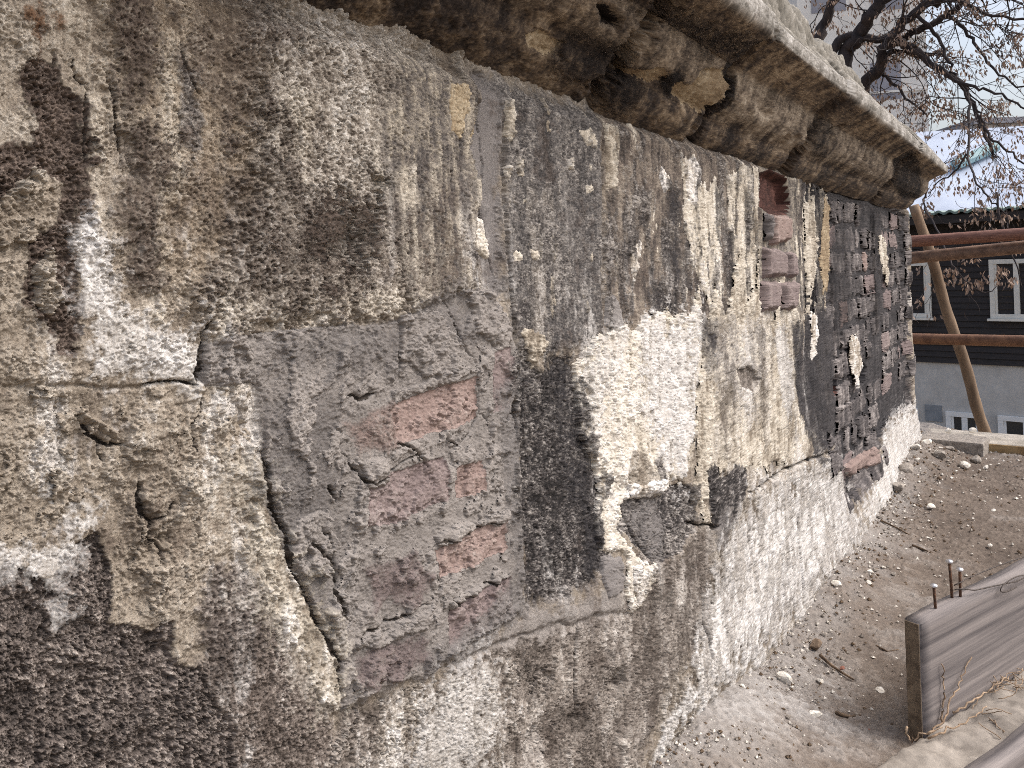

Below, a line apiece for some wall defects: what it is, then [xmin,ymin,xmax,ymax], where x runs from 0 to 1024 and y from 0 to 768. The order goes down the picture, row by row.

peeling [502,86,518,142]
water stain [635,0,761,124]
peeling [509,197,573,262]
water stain [499,33,772,452]
peeling [569,138,916,625]
water stain [0,501,96,577]
peeling [18,385,94,522]
water stain [198,571,273,692]
peeling [117,294,483,710]
crack [260,458,422,685]
water stain [546,342,605,578]
crack [684,521,719,529]